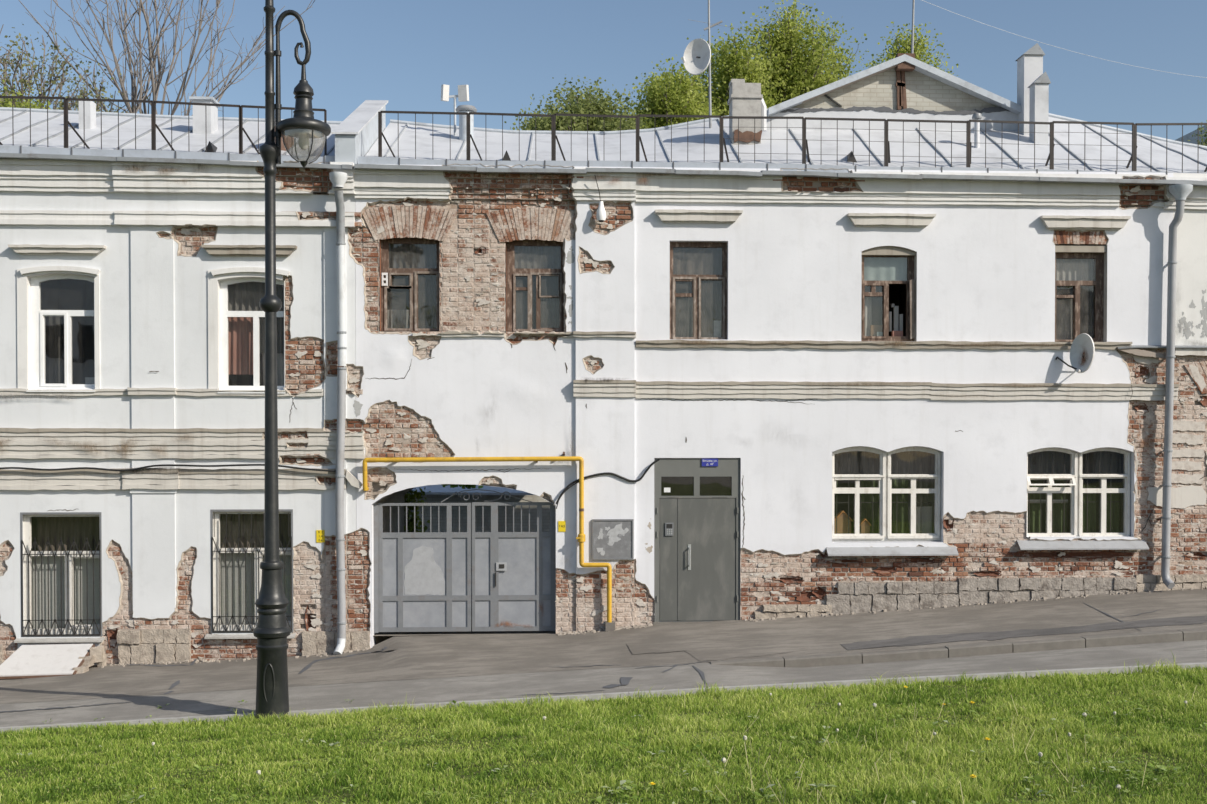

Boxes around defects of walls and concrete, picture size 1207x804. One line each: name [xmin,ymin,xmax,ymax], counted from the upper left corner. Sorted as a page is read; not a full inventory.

spalling [255,160,334,195]
spalling [156,224,218,257]
spalling [296,163,634,360]
spalling [1053,230,1109,245]
spalling [262,275,455,500]
spalling [583,355,604,375]
spalling [740,289,1207,620]
spalling [0,540,15,576]
spalling [0,615,18,661]
spalling [100,539,257,664]
spalling [287,528,372,656]
spalling [555,522,654,634]